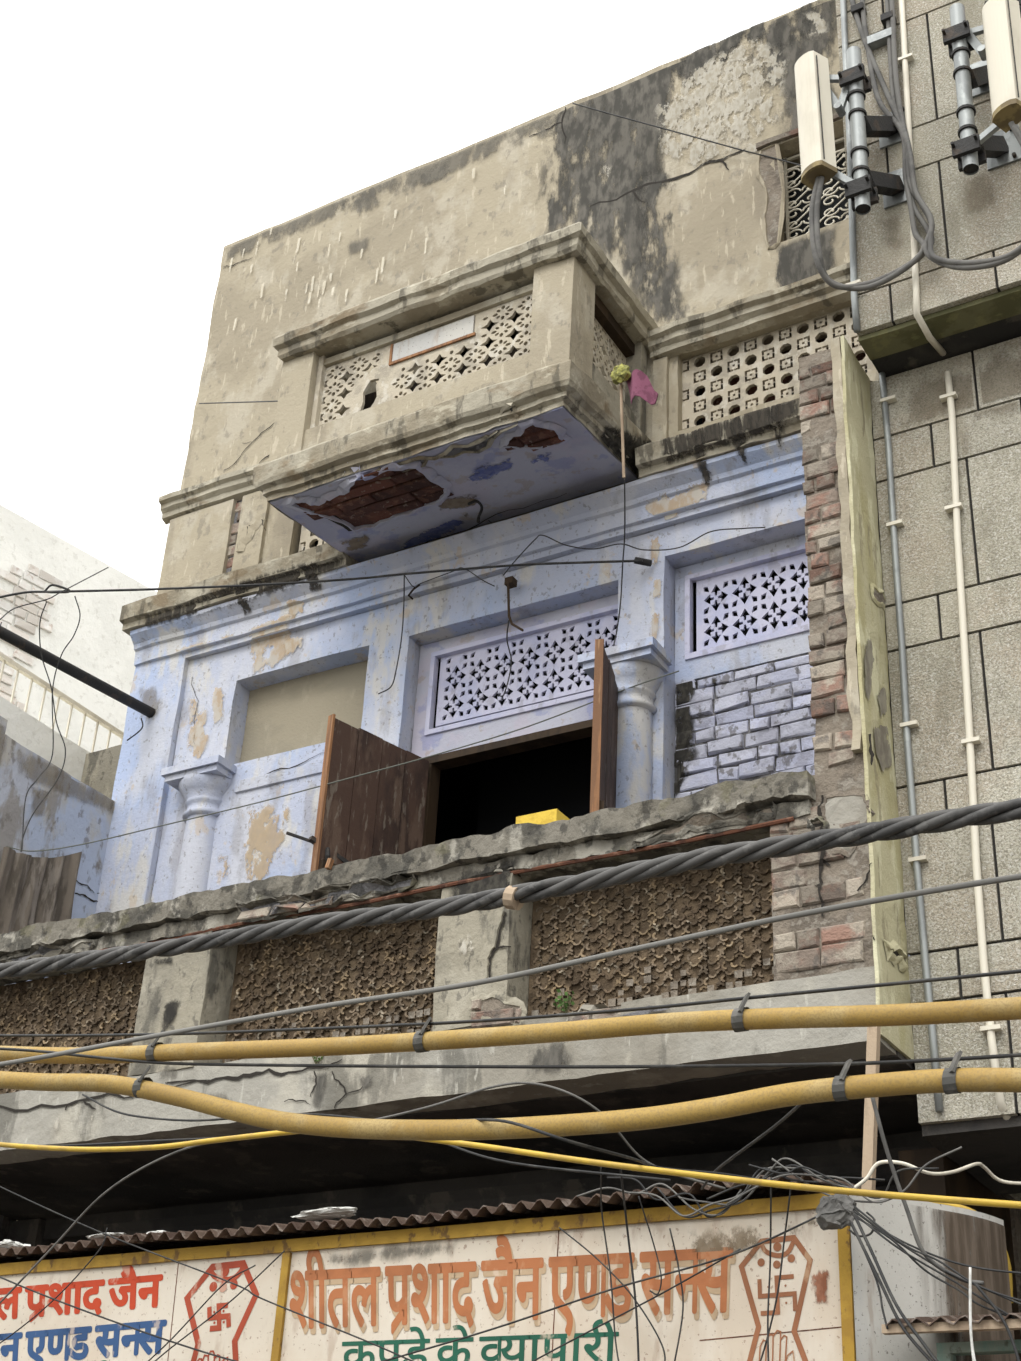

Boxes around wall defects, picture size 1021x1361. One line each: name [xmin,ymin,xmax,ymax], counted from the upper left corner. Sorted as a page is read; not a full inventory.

leakage [228,0,837,320]
crack [590,148,746,207]
spalling [281,402,572,532]
leakage [601,398,798,485]
peeling [176,599,304,672]
peeling [189,687,224,759]
peeling [244,807,288,880]
spalling [235,869,417,922]
crack [477,909,511,980]
crack [0,1093,133,1112]
crack [165,1059,362,1108]